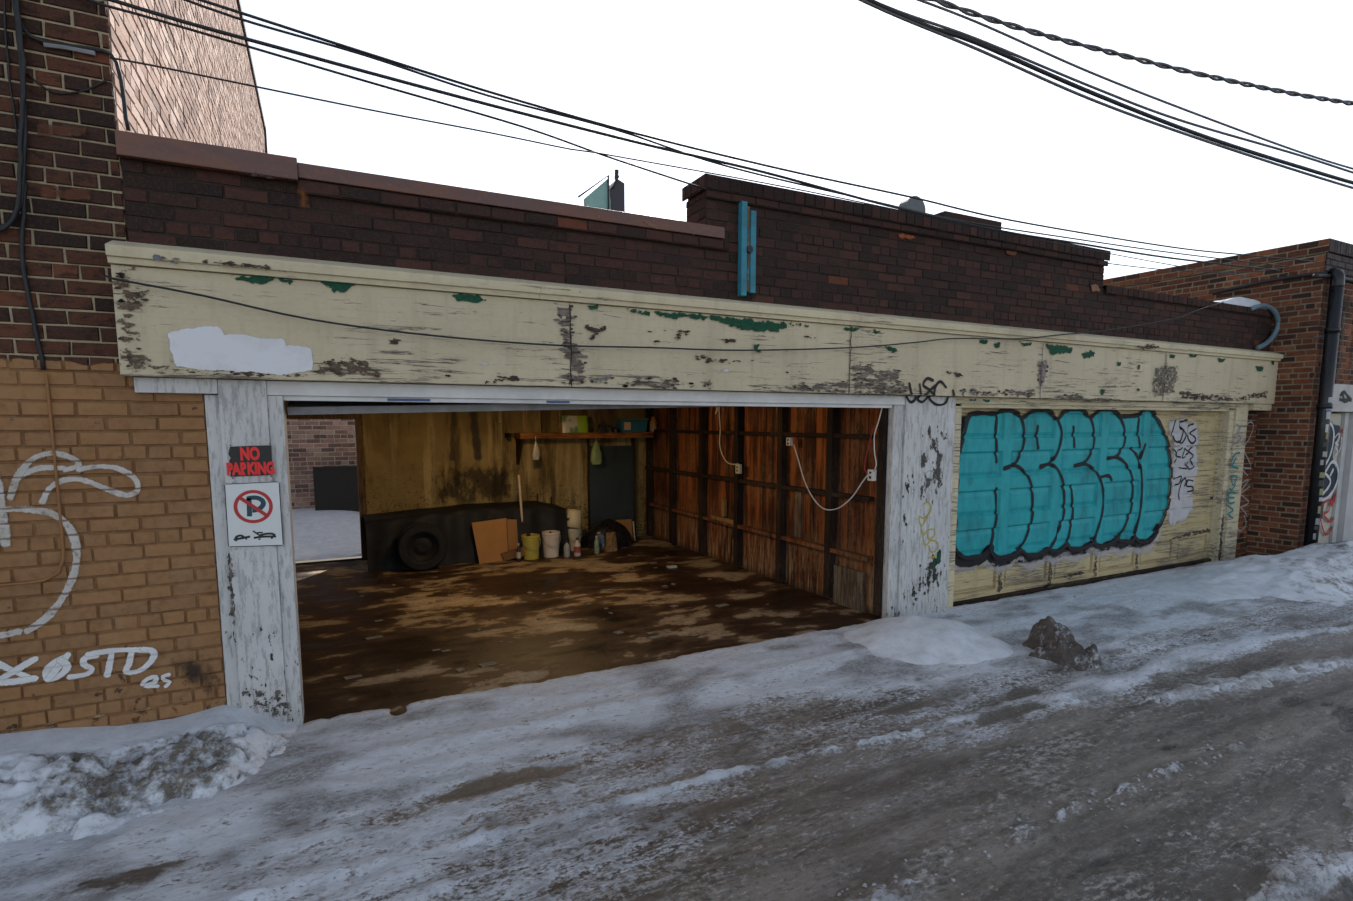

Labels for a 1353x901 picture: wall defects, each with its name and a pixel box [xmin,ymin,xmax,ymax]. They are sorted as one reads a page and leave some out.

peeling [112,264,381,380]
peeling [554,303,711,389]
peeling [627,308,816,364]
peeling [763,361,909,398]
peeling [844,327,897,353]
peeling [947,341,1095,402]
peeling [1055,389,1121,402]
peeling [1137,344,1268,401]
peeling [902,425,947,542]
peeling [227,553,236,646]
peeling [911,550,942,606]
peeling [237,683,294,722]